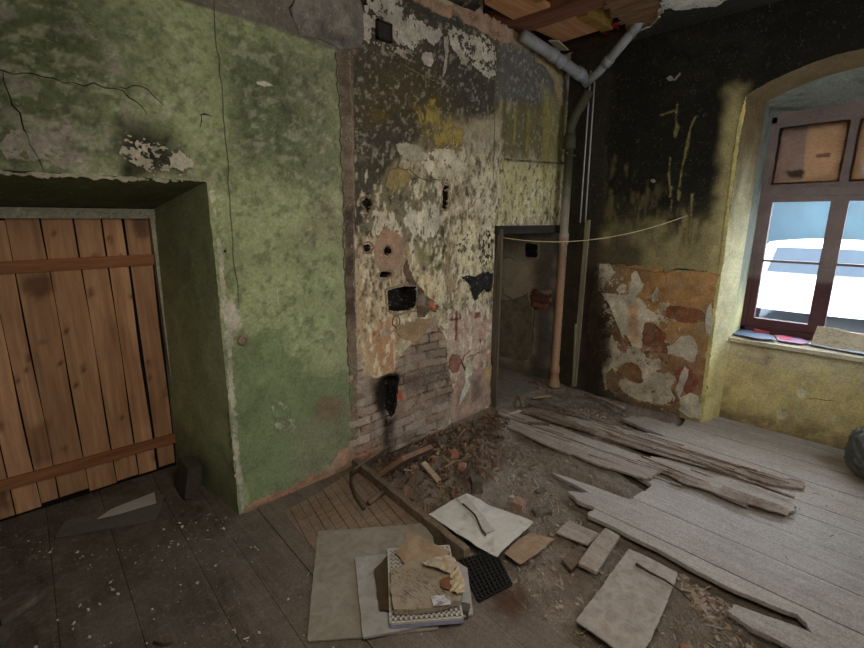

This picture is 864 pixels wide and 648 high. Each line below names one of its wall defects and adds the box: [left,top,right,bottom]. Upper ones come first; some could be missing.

spalling [363,0,564,106]
crack [0,69,163,192]
peeling [0,118,196,183]
crack [200,0,239,302]
peeling [396,142,465,238]
spalling [523,241,540,261]
flaking render [594,97,746,419]
flaking render [209,189,494,513]